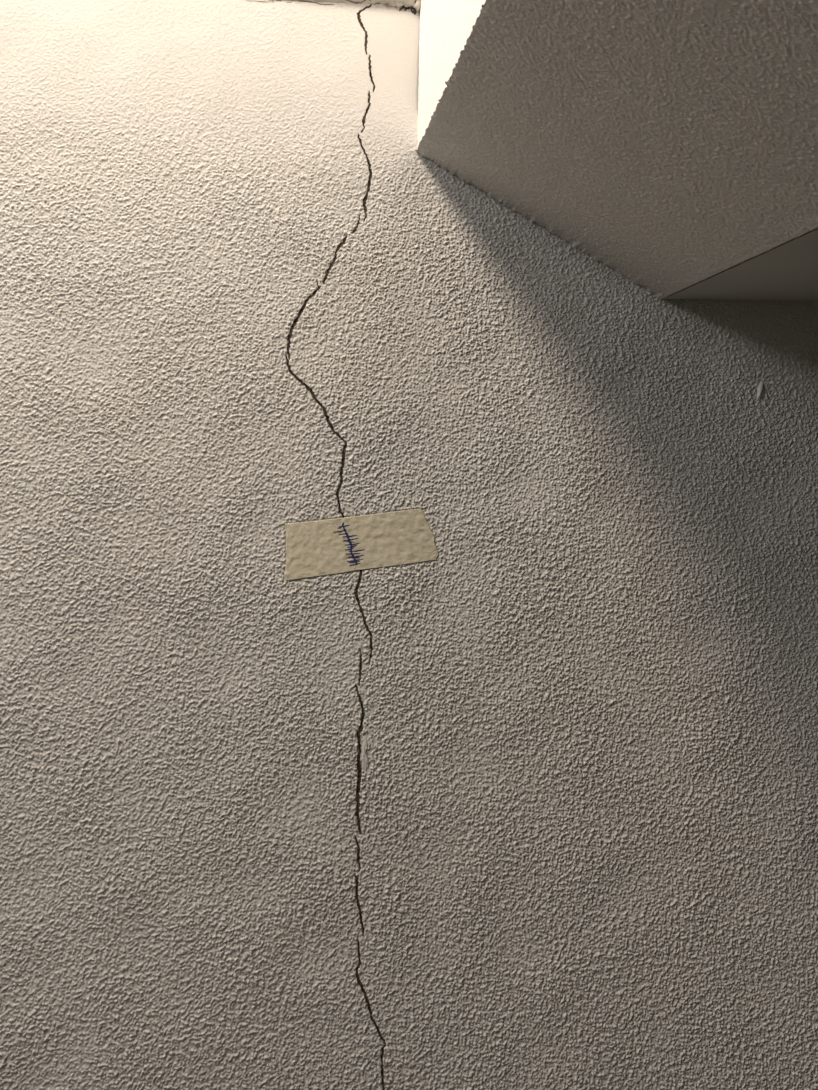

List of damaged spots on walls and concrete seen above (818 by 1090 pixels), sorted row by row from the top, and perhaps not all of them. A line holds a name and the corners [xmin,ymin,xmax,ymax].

crack [246,0,381,518]
crack [354,570,386,1090]